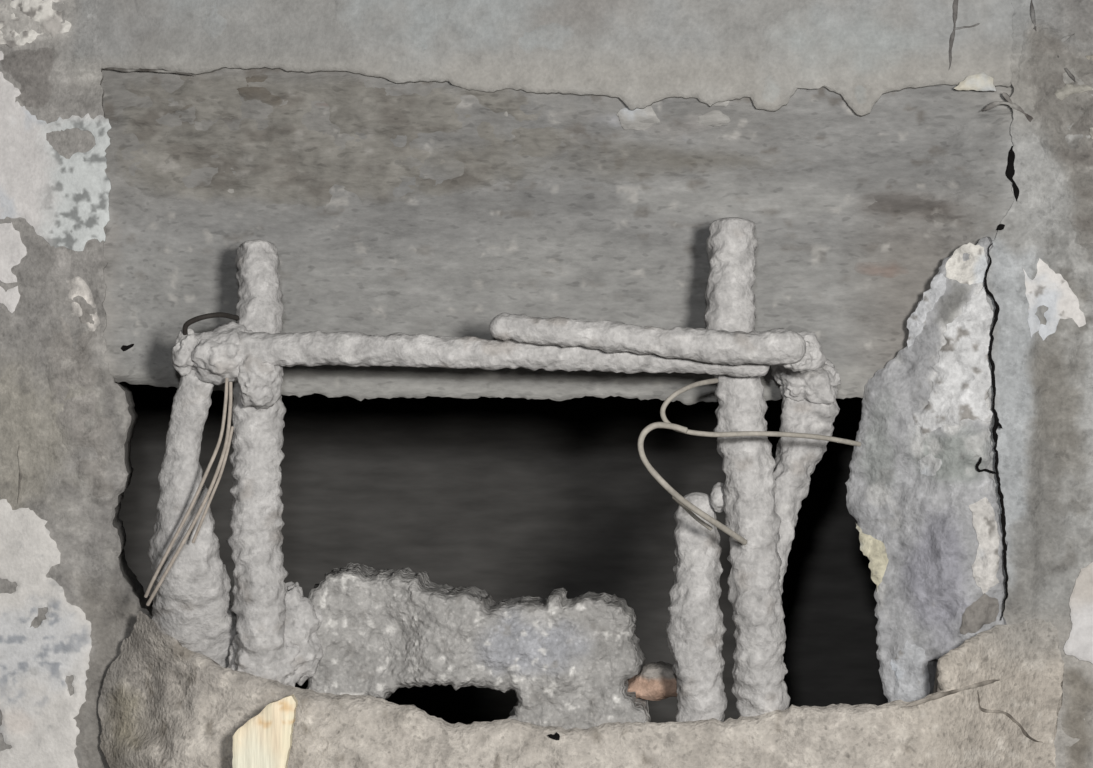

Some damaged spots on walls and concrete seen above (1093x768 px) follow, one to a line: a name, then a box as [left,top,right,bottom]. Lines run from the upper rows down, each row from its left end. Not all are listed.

spalling [0,0,731,331]
spalling [148,217,841,722]
peeling [954,72,996,91]
crack [976,224,1009,620]
crack [1005,146,1019,201]
peeling [1023,258,1086,341]
peeling [0,499,92,768]
spalling [1061,562,1093,768]